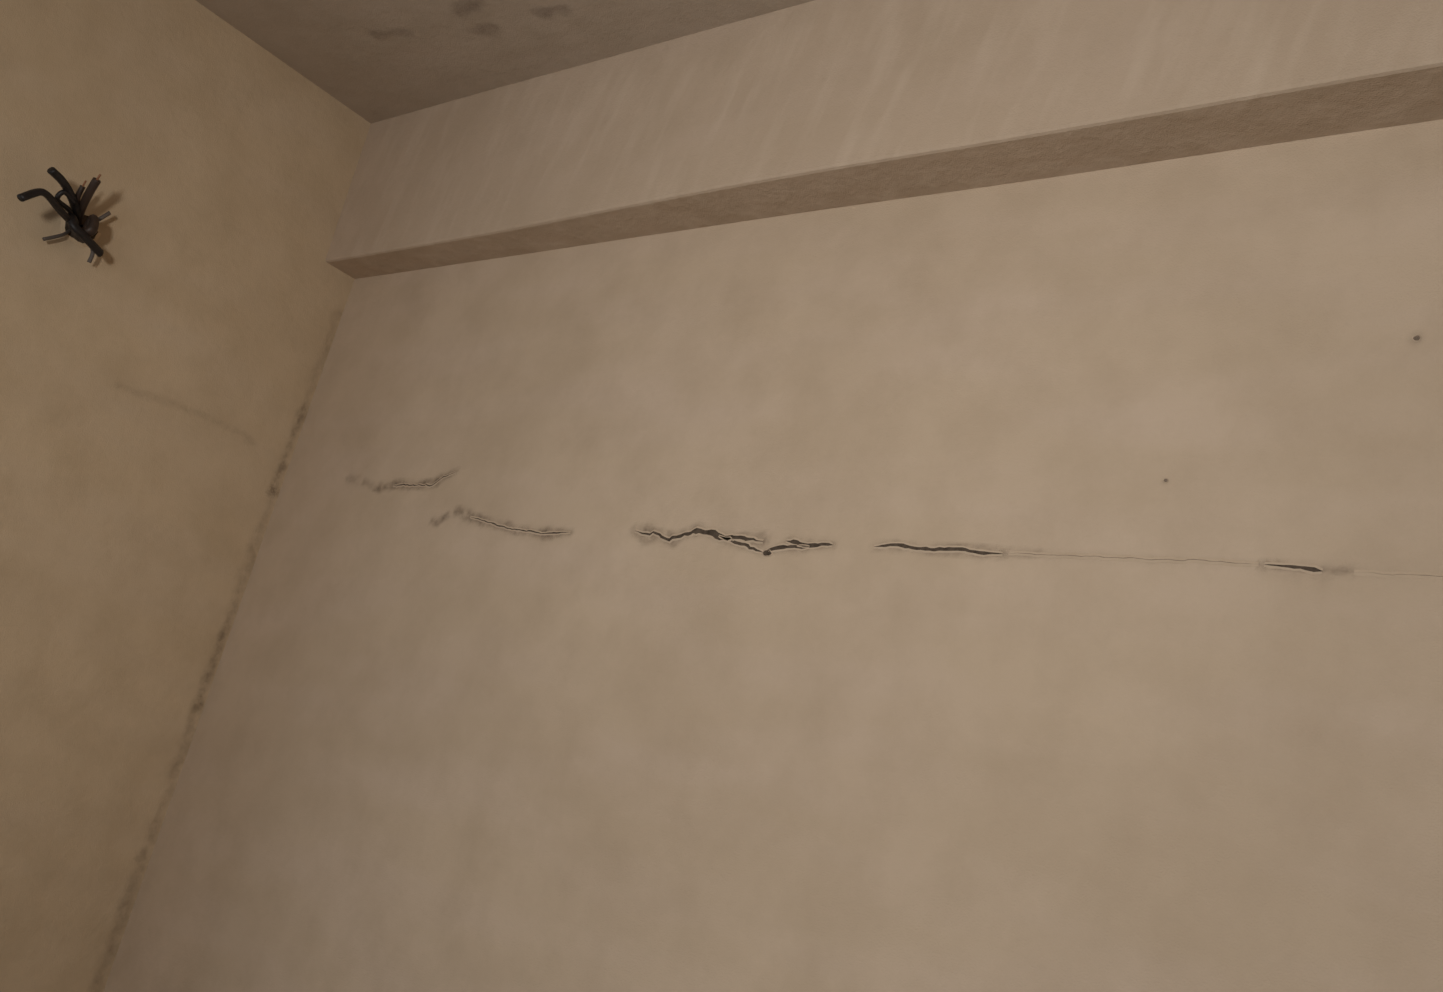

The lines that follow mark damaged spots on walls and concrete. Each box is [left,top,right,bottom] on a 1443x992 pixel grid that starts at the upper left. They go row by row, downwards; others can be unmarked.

crack [393,471,456,488]
crack [469,515,571,536]
crack [635,526,833,557]
crack [874,541,1443,580]